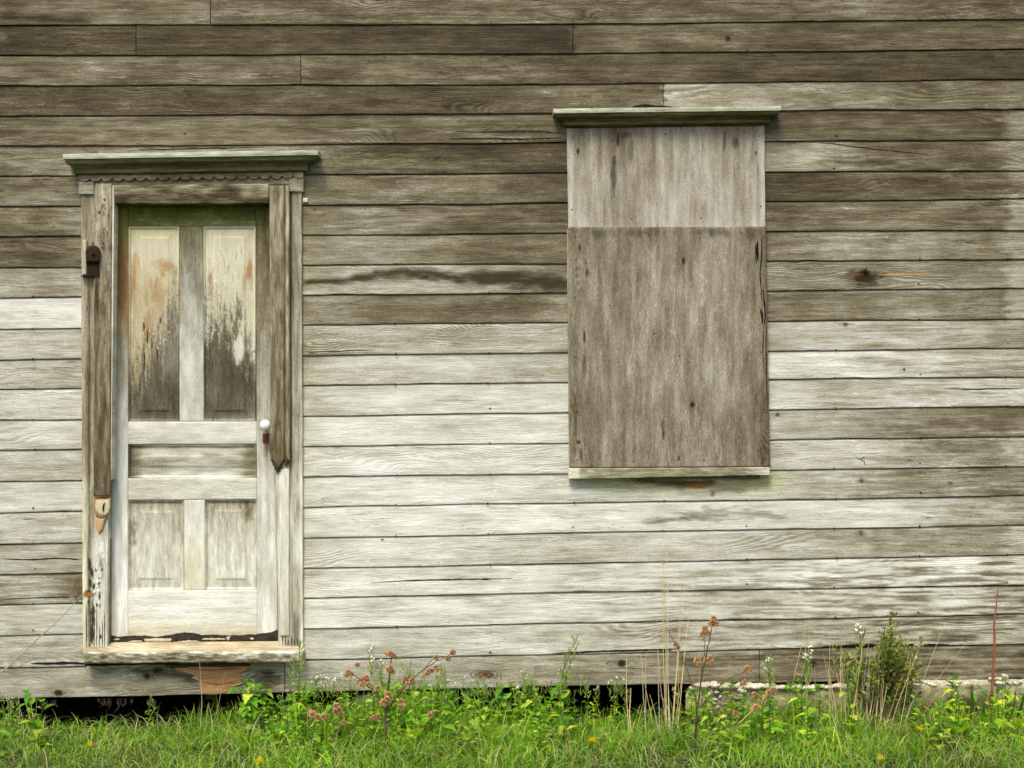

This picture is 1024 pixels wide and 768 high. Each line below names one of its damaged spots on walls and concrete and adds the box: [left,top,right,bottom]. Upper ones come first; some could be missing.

leakage [305,268,567,290]
peeling [143,317,170,370]
rust [631,479,715,495]
peeling [85,527,105,647]
crack [372,576,511,584]